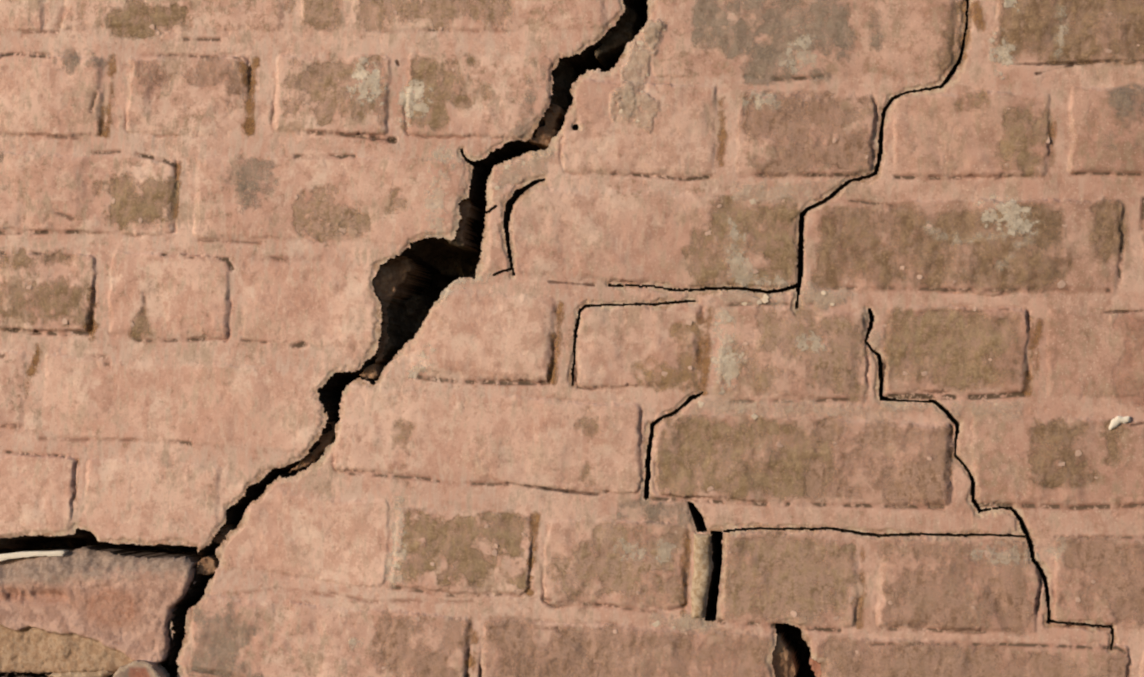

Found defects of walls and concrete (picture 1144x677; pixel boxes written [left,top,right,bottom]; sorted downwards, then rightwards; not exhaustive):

crack [0,0,648,677]
crack [643,391,703,500]
crack [571,0,969,386]
crack [687,308,1114,650]
crack [1037,61,1110,74]